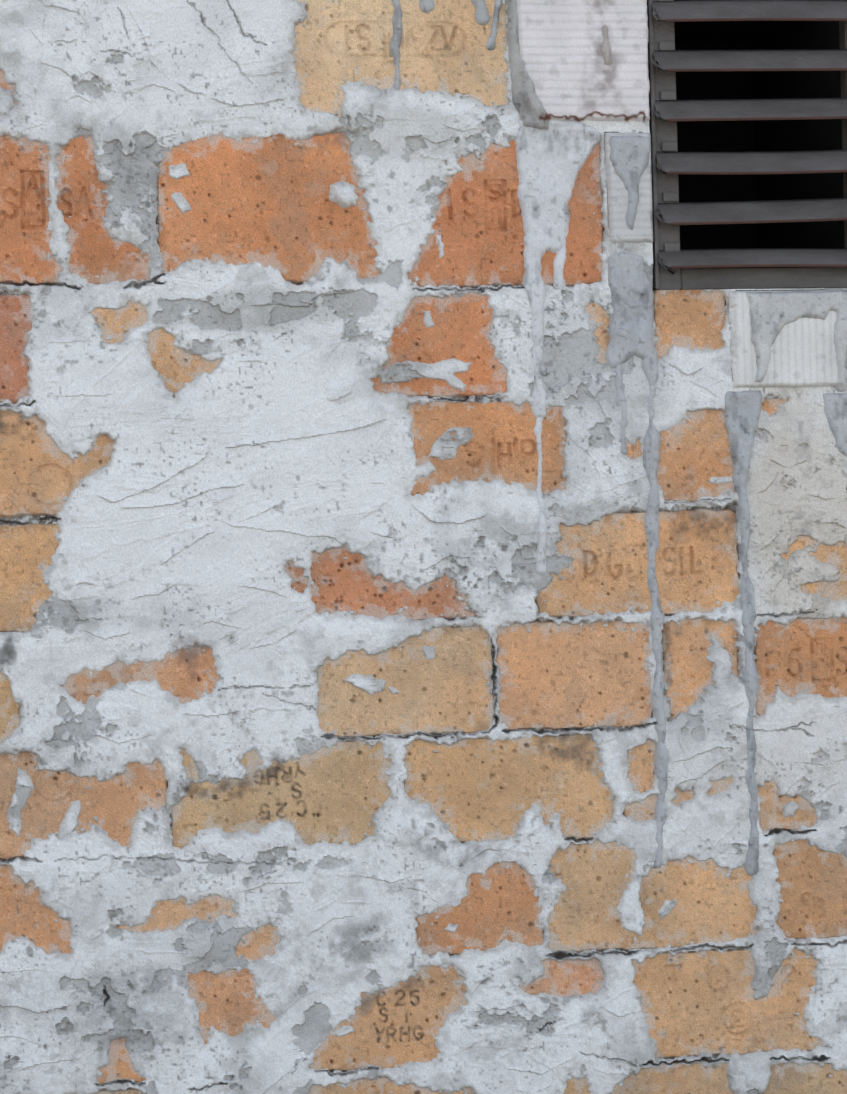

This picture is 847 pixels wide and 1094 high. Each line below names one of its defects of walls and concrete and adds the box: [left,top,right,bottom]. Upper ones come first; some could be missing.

spalling [0,71,18,105]
water stain [389,0,403,90]
spalling [292,0,509,117]
water stain [419,0,435,13]
water stain [471,0,503,51]
spalling [541,143,604,286]
spalling [0,132,381,632]
spalling [371,140,567,496]
water stain [615,365,628,455]
water stain [641,329,669,868]
spalling [0,409,847,1094]
water stain [736,495,759,876]